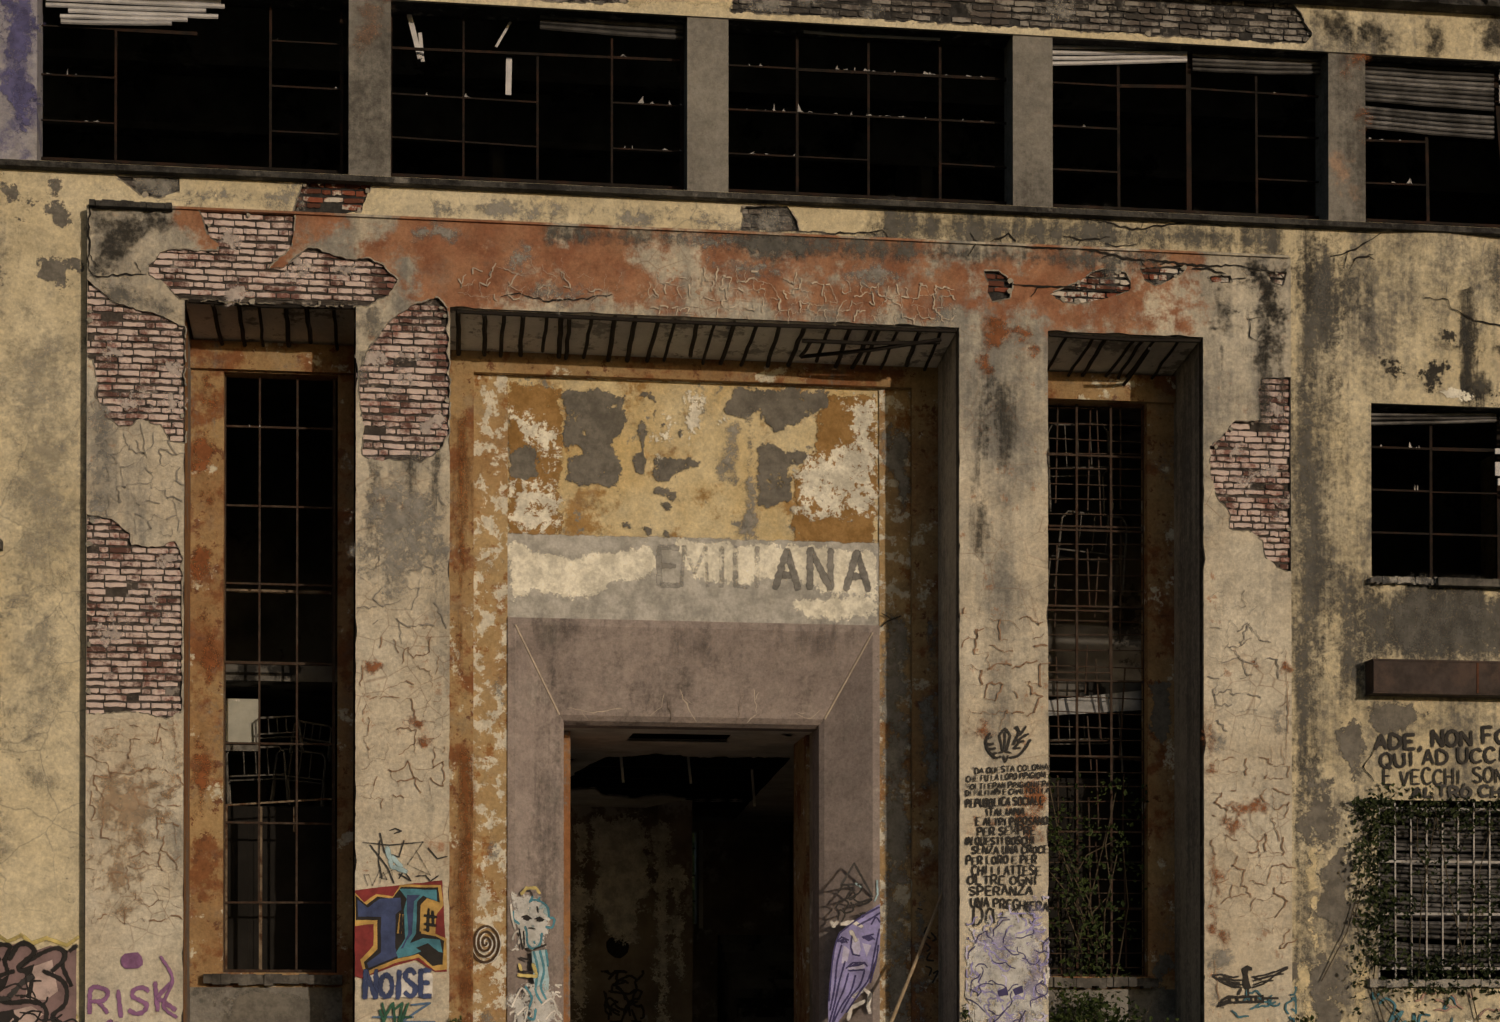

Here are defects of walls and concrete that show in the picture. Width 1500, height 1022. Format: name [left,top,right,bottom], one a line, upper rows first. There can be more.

water stain [187,182,304,208]
flaking render [148,183,399,308]
flaking render [36,256,187,720]
rust [190,544,211,583]
rust [193,437,214,472]
flaking render [355,296,452,463]
rust [458,419,472,587]
water stain [434,198,1500,963]
rust [975,317,1201,386]
flaking render [1209,376,1293,572]
flaking render [507,382,911,1022]
rust [457,750,476,999]